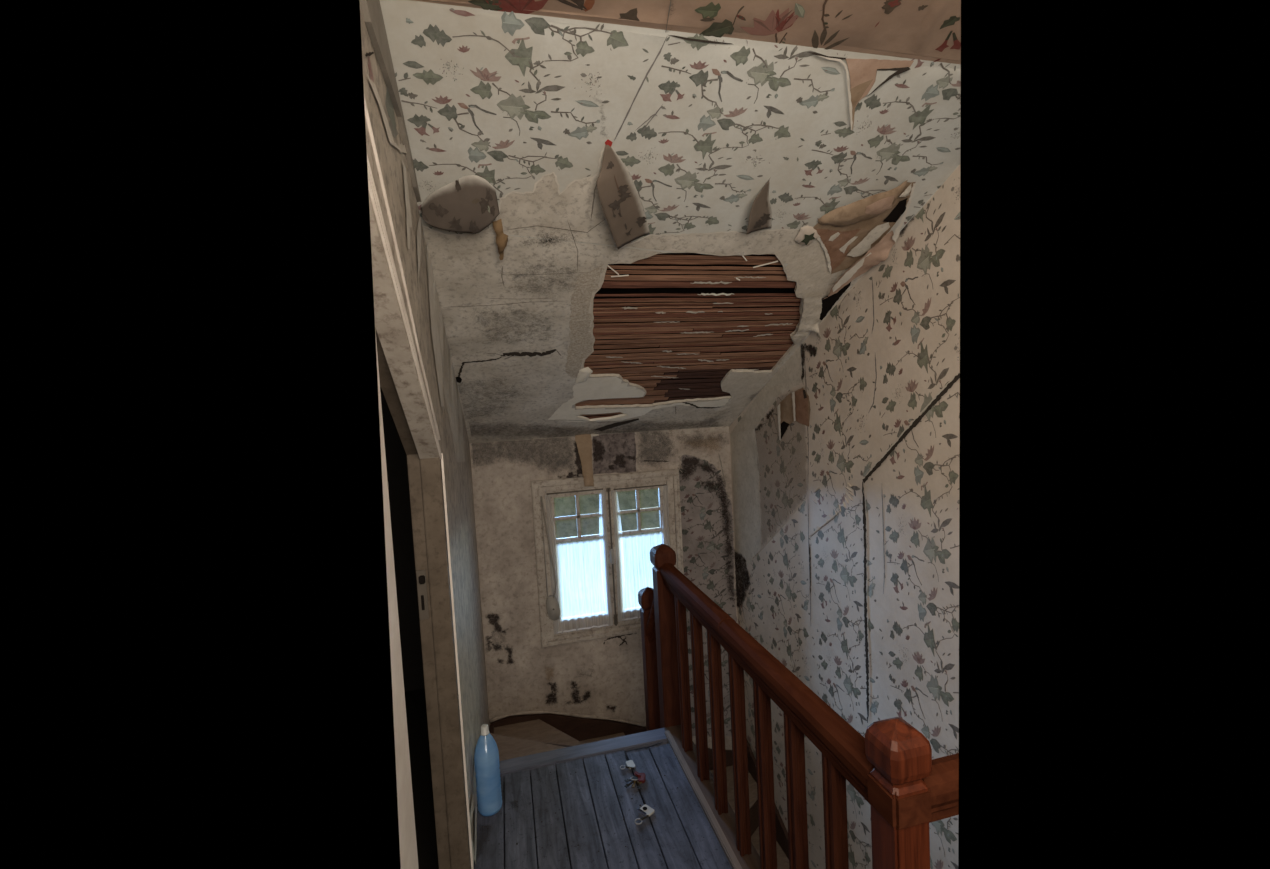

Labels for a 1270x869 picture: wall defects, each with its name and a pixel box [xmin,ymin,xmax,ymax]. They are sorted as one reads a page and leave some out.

flaking render [367,74,865,579]
crack [442,349,561,444]
water stain [471,420,750,622]
water stain [486,613,514,664]
water stain [686,608,732,737]